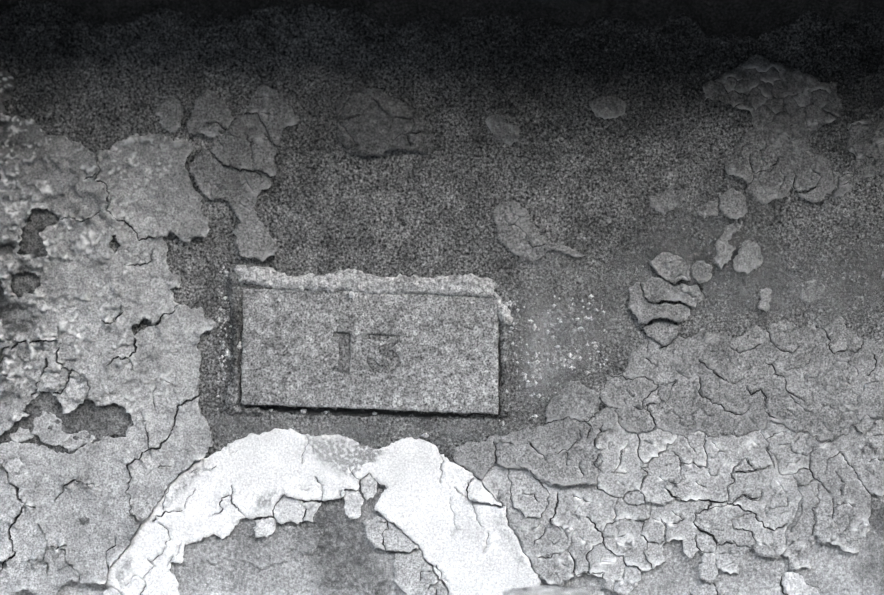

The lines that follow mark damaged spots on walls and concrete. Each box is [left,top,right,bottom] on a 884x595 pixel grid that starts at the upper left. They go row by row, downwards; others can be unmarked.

crack [55,165,160,266]
peeling [186,85,300,262]
peeling [485,114,521,145]
peeling [492,200,585,263]
crack [3,336,90,395]
peeling [0,67,217,595]
crack [102,300,182,367]
crack [260,327,502,419]
crack [1,467,66,571]
crack [105,385,200,595]
peeling [103,316,884,595]
crack [439,328,877,580]